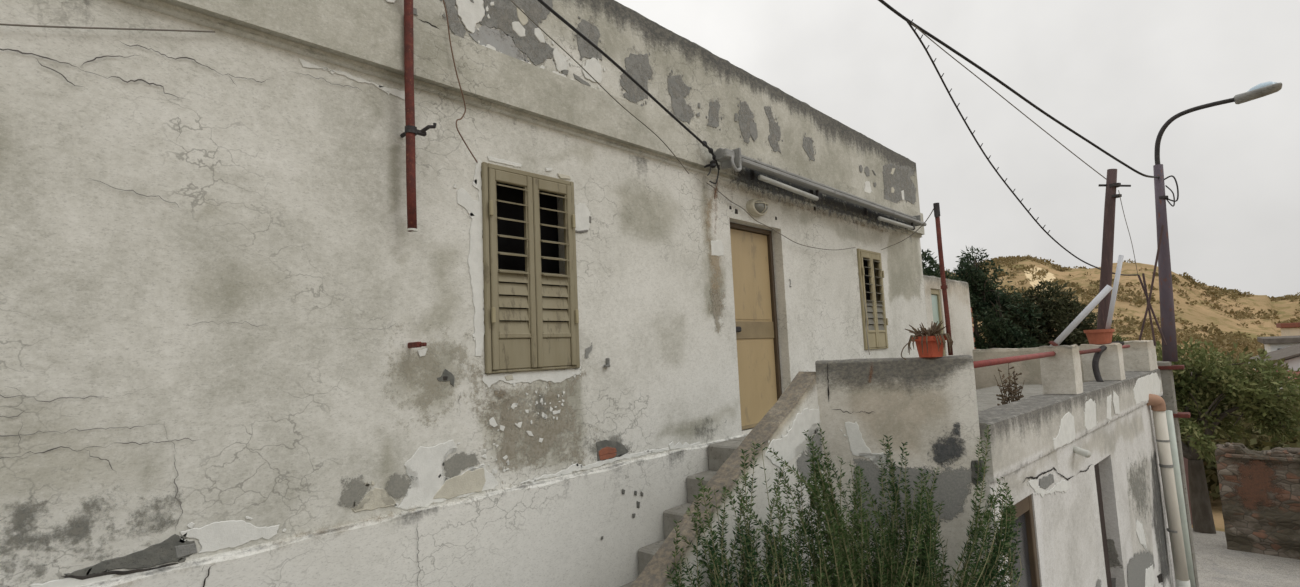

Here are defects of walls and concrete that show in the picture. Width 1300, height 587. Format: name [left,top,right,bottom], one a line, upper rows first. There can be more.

crack [0,39,372,138]
flaking render [440,0,783,153]
crack [89,178,179,207]
flaking render [859,162,916,204]
water stain [389,333,628,474]
crack [0,386,201,530]
peeling [338,439,498,513]
flaking render [840,422,986,533]
crack [1025,464,1092,481]
water stain [2,502,100,552]
flaking render [29,516,286,587]
flaking render [1096,520,1163,587]